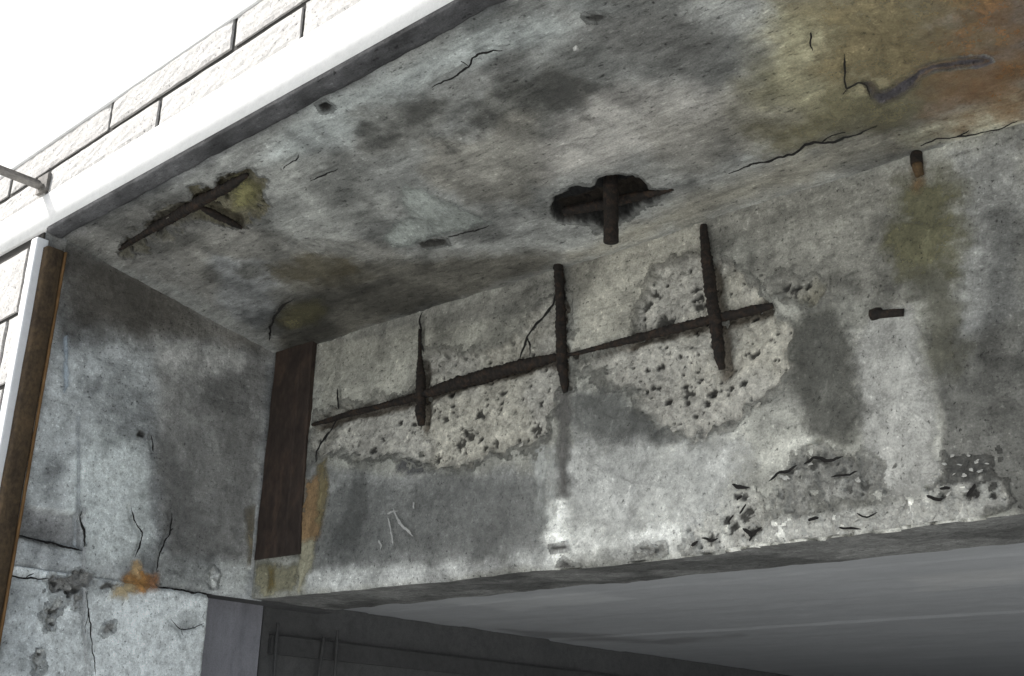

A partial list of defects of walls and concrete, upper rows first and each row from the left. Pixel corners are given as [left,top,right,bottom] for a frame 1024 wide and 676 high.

crack [432,50,503,88]
crack [728,125,877,174]
spalling [115,167,273,261]
spalling [546,172,674,236]
rust [272,253,355,282]
spalling [307,224,831,476]
damp [794,274,959,497]
crack [19,511,86,551]
rust [113,561,158,596]
crack [131,508,212,595]
rust [246,460,328,597]
peeling [627,442,1016,562]